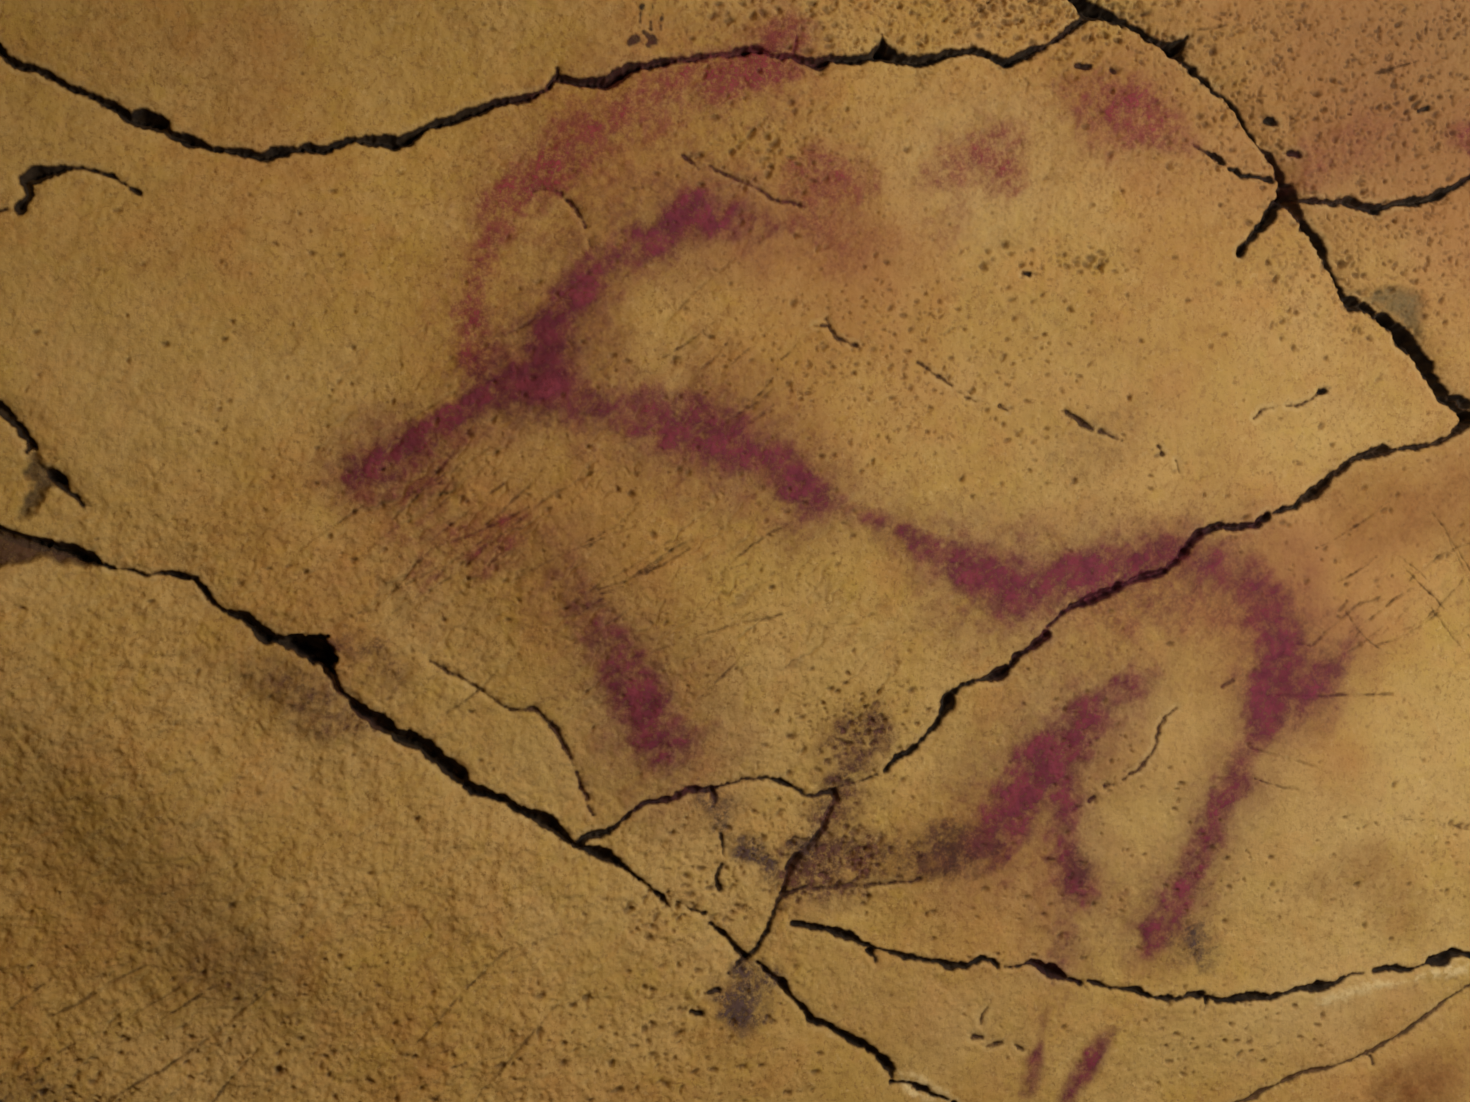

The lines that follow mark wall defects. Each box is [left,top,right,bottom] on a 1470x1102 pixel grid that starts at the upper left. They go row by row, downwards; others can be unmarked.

crack [0,0,1470,781]
crack [0,525,956,1102]
crack [1077,710,1174,809]
crack [790,920,1470,1005]
crack [971,1008,1024,1051]
crack [1235,984,1470,1102]